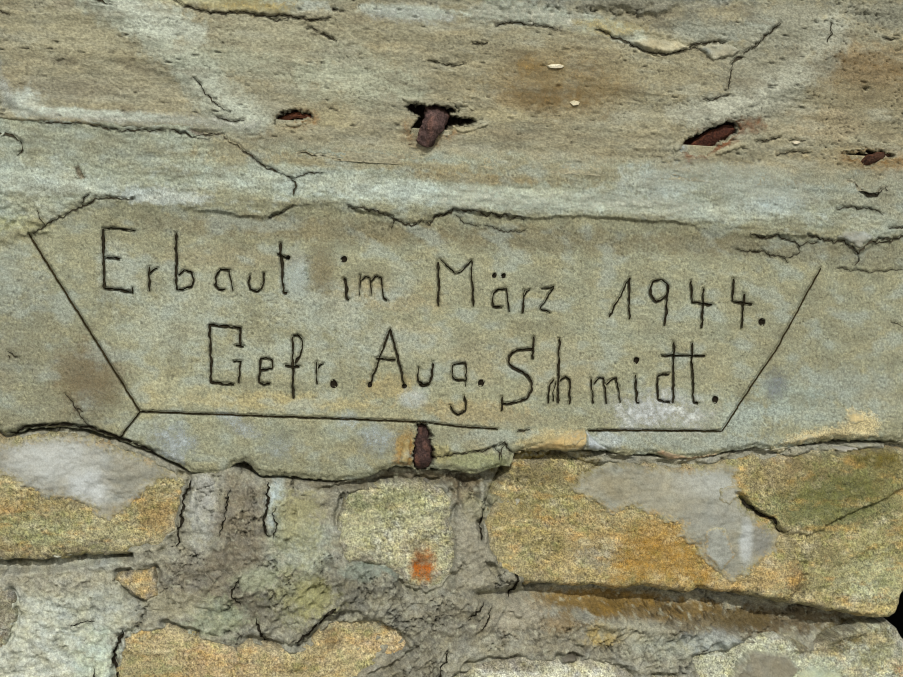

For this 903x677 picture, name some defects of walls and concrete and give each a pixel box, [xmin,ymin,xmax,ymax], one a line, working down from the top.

crack [595,23,781,101]
crack [0,132,23,155]
crack [40,77,341,218]
crack [738,496,783,532]
rust [413,556,433,580]